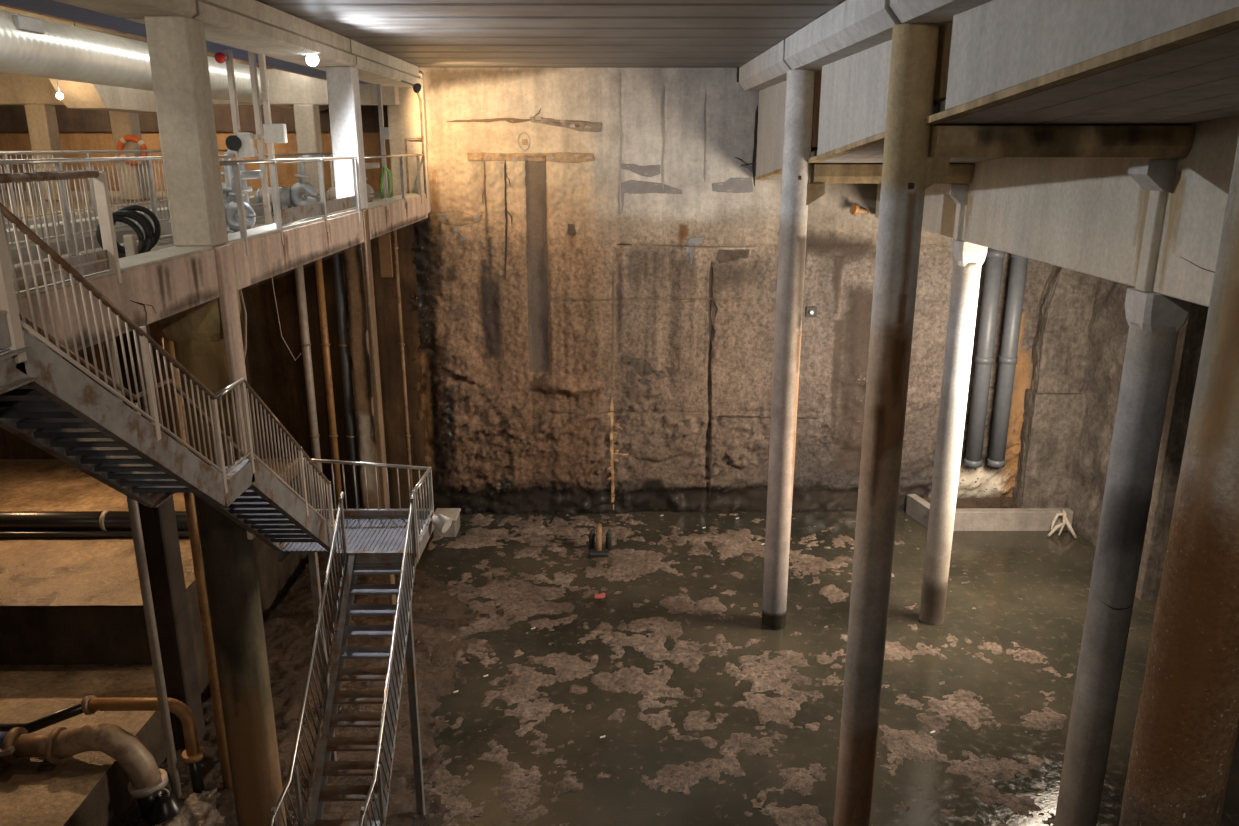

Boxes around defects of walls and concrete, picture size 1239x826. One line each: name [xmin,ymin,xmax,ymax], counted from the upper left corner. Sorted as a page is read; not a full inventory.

water stain [386,203,768,514]
corrosion [875,195,914,471]
water stain [792,489,858,512]
corrosion [848,732,877,823]